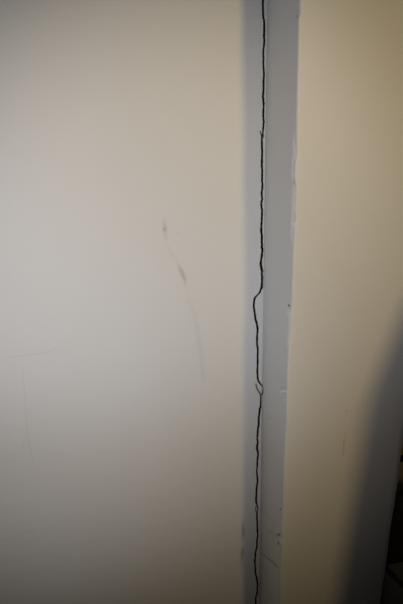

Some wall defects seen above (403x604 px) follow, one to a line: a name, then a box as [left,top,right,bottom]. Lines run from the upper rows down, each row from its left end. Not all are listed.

crack [253,0,266,604]